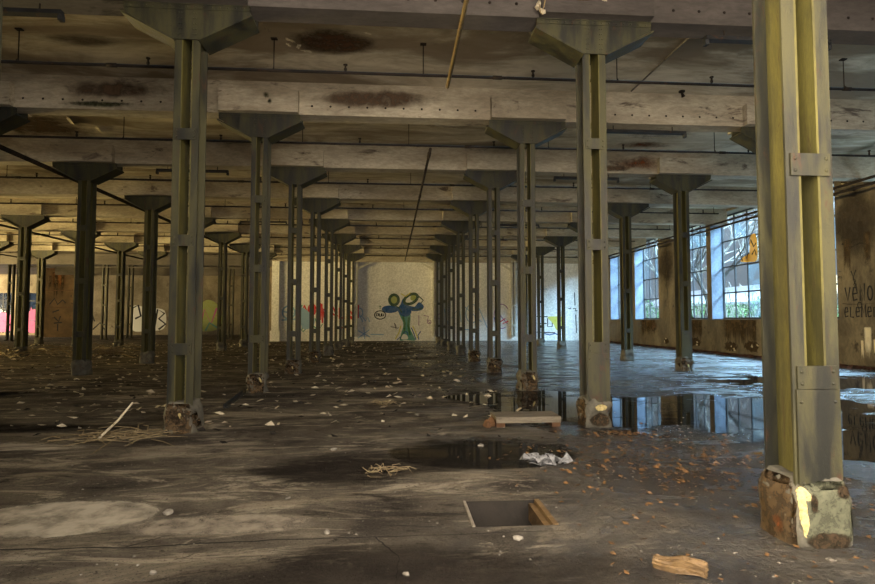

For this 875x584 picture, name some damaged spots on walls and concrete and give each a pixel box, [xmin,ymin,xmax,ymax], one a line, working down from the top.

leakage [286,30,371,53]
leakage [330,91,420,107]
leakage [641,320,656,332]
leakage [692,318,702,333]
leakage [723,318,756,341]
leakage [861,327,875,356]
spalling [837,485,850,499]
spalling [795,487,819,538]